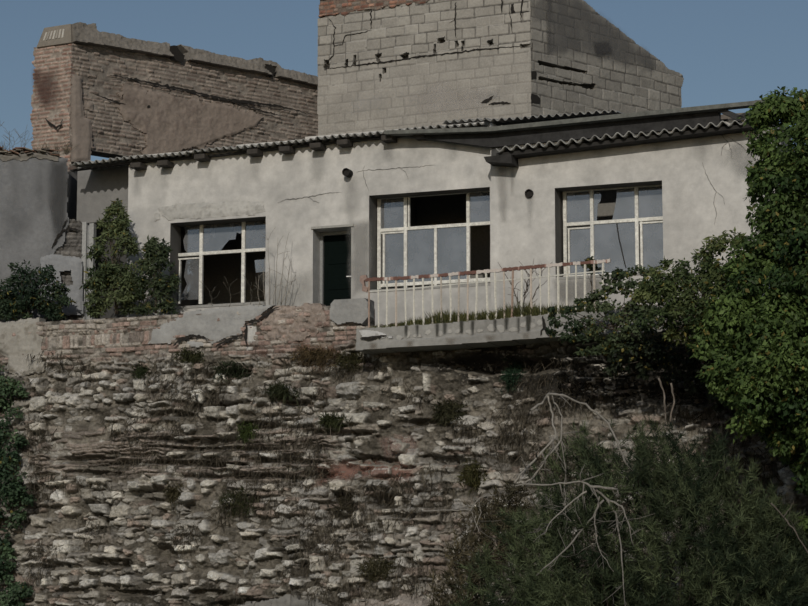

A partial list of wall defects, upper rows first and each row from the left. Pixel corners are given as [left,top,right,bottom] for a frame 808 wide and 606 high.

hole [170,45,185,63]
crack [325,0,533,73]
flaking render [115,83,263,155]
crack [358,166,424,190]
flaking render [0,317,46,376]
flaking render [148,303,327,351]